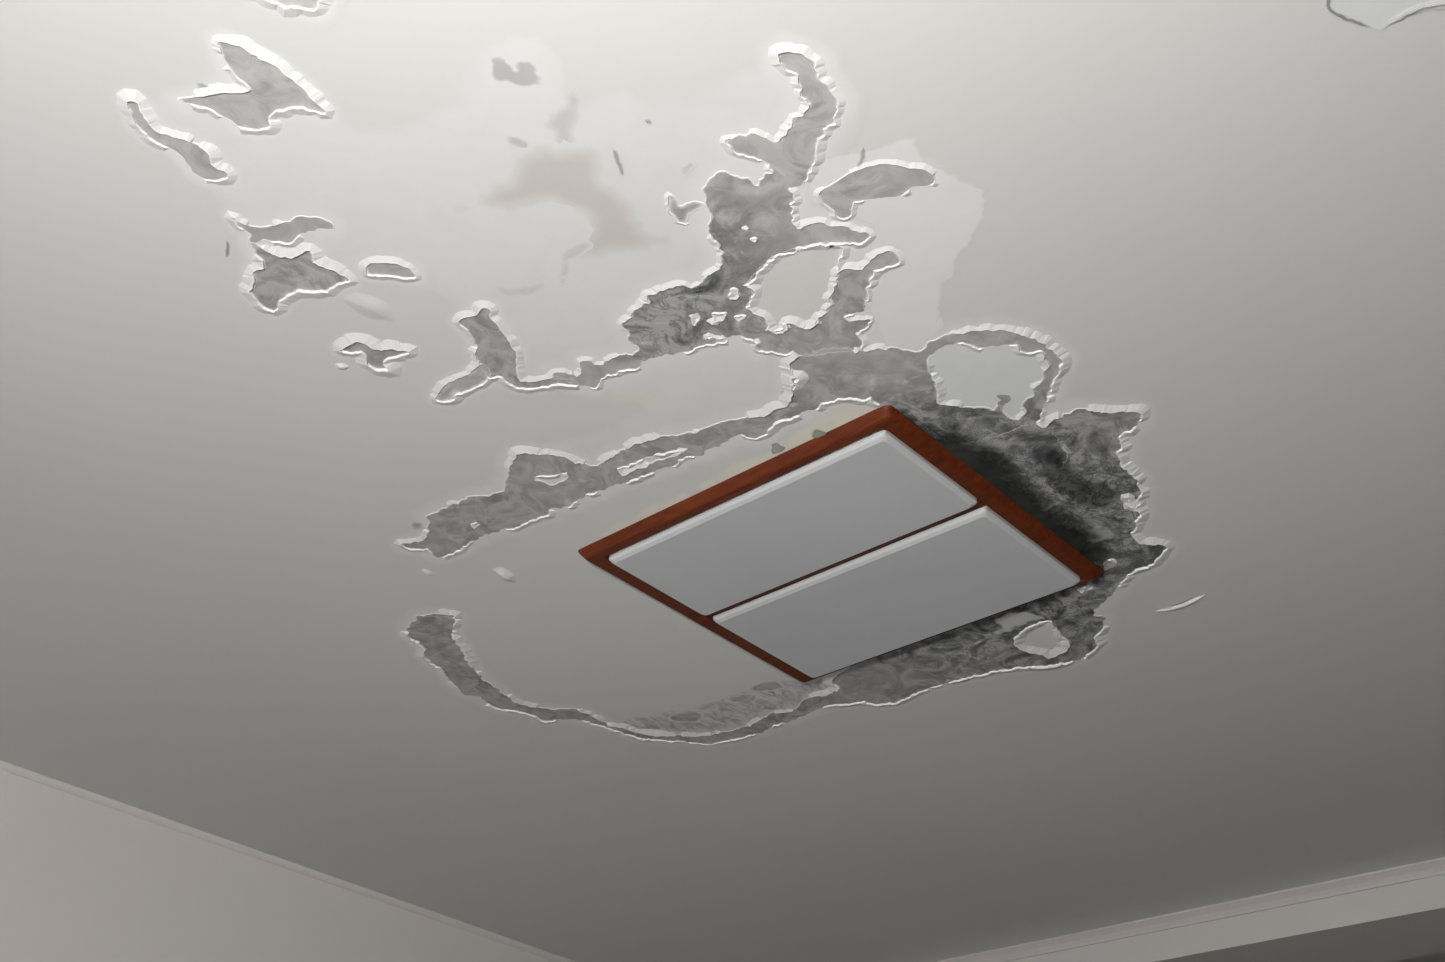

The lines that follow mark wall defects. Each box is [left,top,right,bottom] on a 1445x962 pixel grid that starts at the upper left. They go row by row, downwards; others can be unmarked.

peeling [102,0,440,325]
leakage [449,30,677,298]
peeling [319,21,1192,752]
leakage [916,425,1104,579]